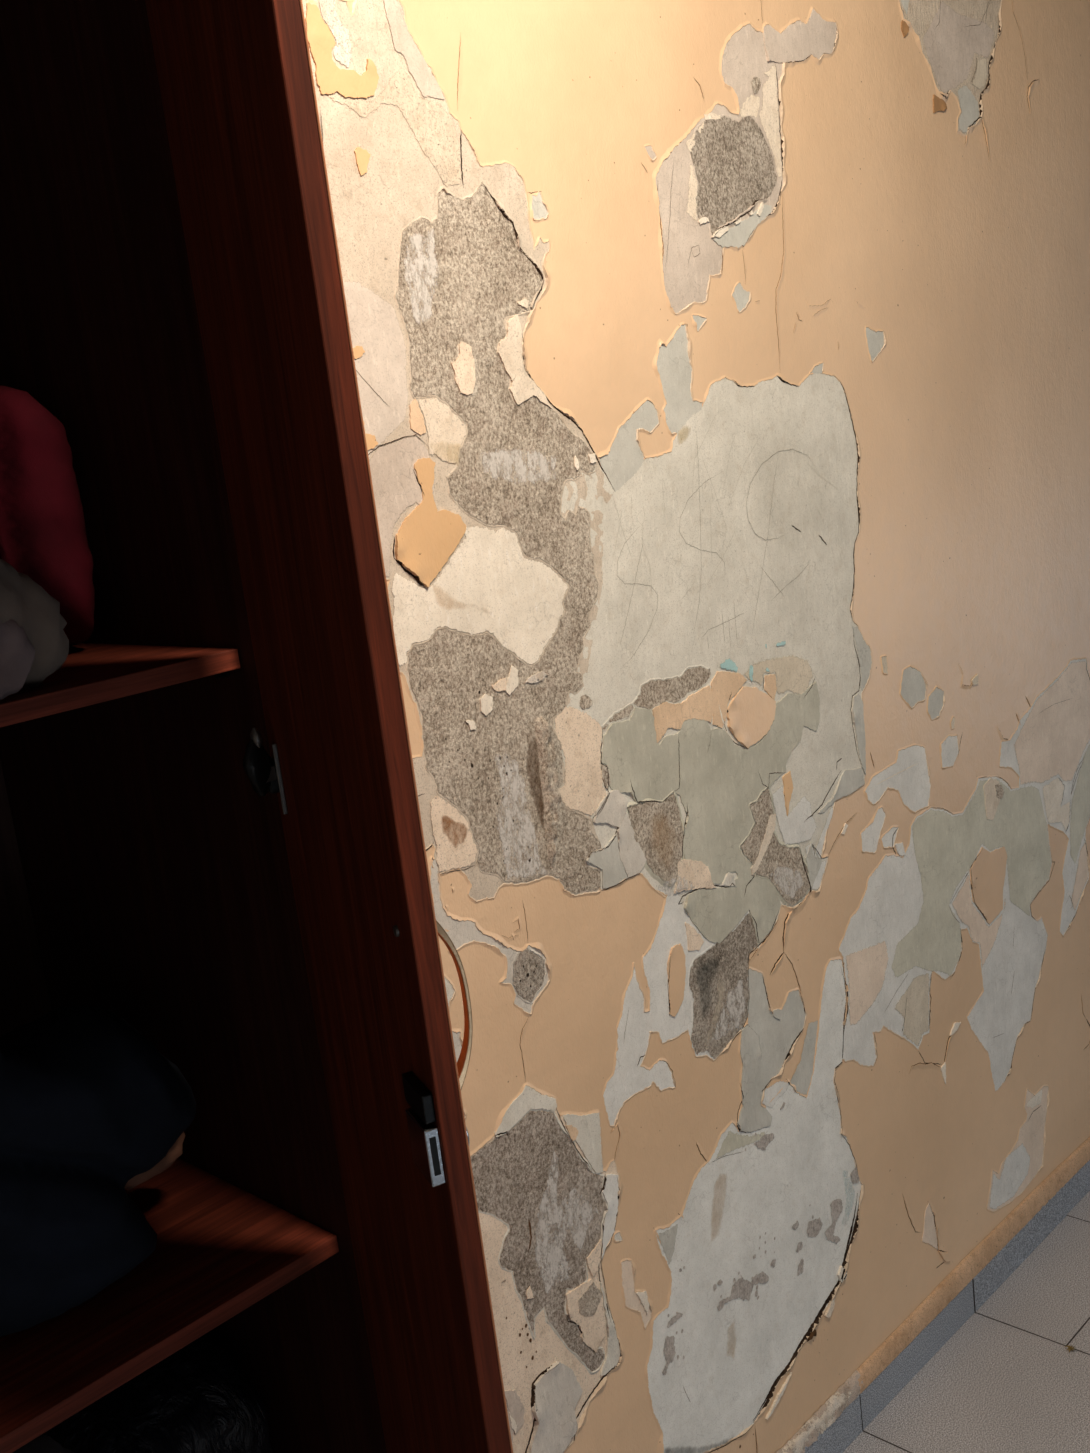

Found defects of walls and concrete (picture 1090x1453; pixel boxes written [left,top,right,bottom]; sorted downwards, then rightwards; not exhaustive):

peeling [302,0,1090,1453]